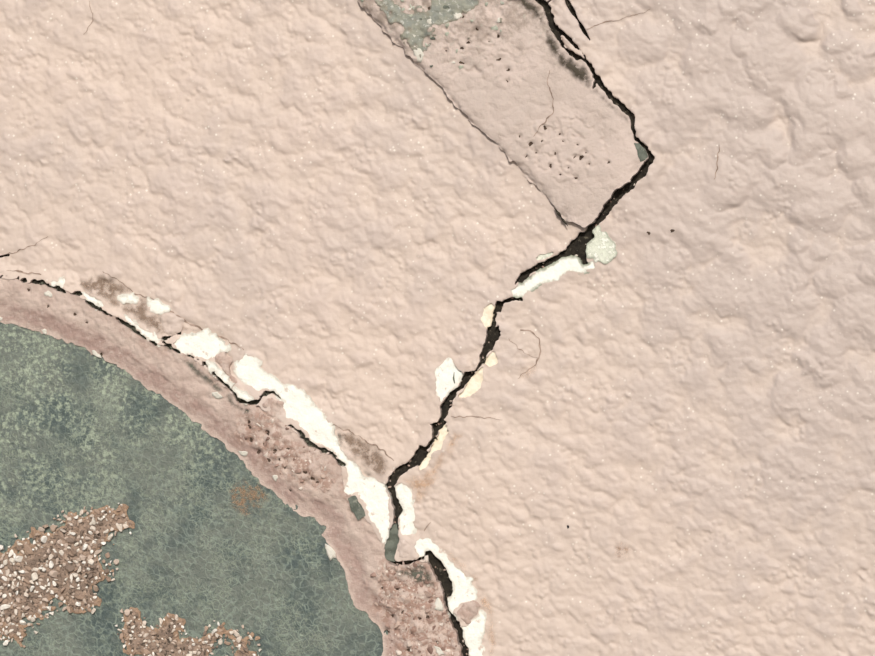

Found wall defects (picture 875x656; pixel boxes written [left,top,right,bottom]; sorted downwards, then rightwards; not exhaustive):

peeling [375,0,488,70]
peeling [44,276,65,308]
peeling [81,292,103,311]
crack [0,236,281,405]
peeling [481,303,496,329]
crack [332,0,655,530]
peeling [435,351,498,403]
peeling [115,292,487,656]
crack [289,424,346,466]
spalling [0,503,135,648]
crack [391,522,469,656]